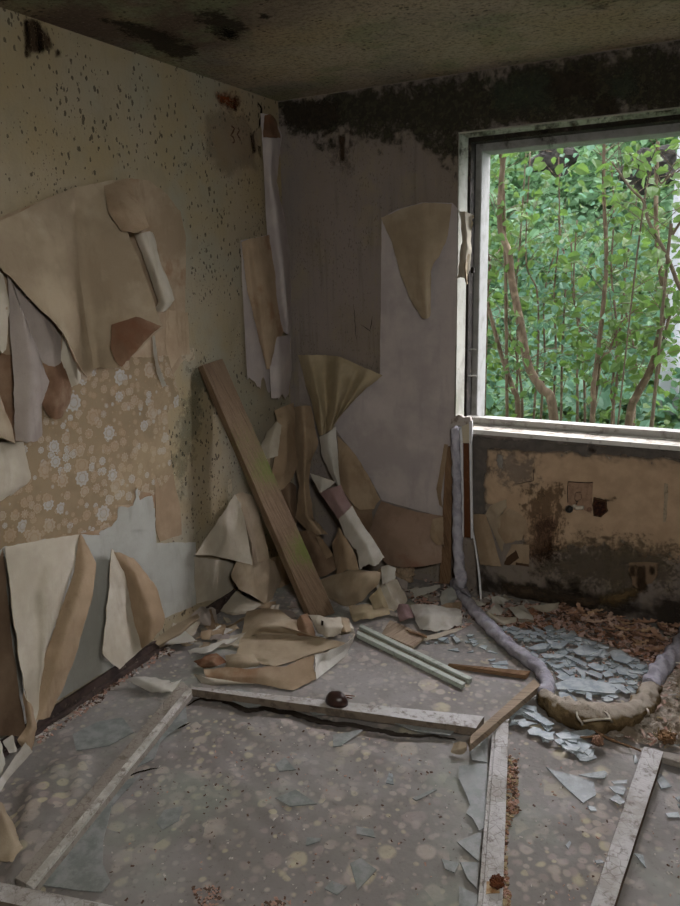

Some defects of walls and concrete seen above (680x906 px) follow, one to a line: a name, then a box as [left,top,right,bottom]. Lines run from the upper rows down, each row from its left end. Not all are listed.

mould [24,19,60,57]
mould [98,18,198,58]
mould [194,8,249,41]
mould [278,40,680,175]
hole [592,497,616,517]
leakage [468,436,680,624]